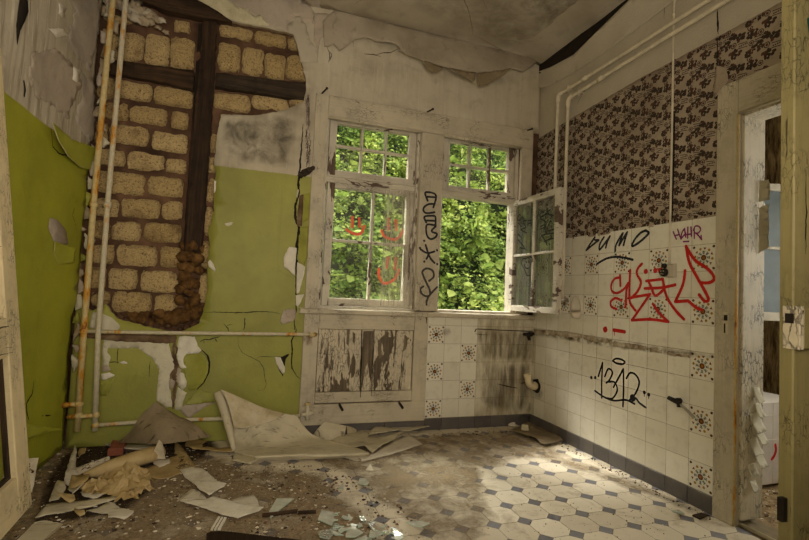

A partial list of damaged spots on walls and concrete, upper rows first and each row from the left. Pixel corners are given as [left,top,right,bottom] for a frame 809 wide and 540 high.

crack [170,337,179,409]
flaking render [28,0,332,418]
crack [200,93,311,391]
peeling [346,329,390,391]